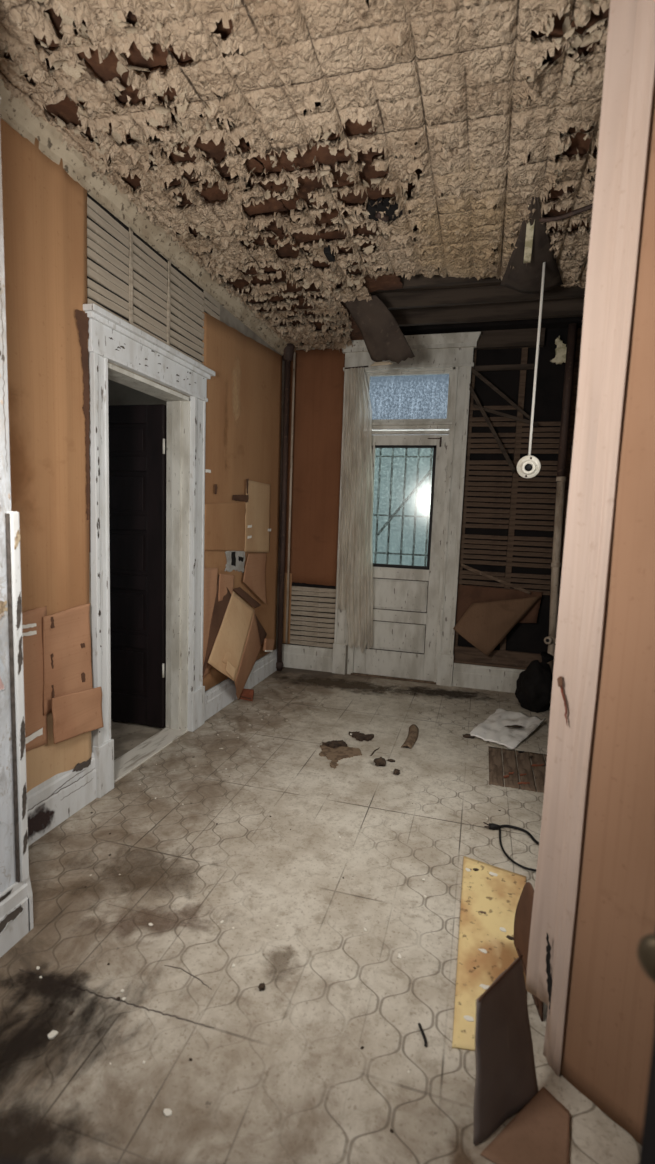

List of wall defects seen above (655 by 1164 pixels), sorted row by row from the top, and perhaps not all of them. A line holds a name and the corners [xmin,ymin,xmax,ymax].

peeling [516,0,610,113]
peeling [4,0,412,350]
peeling [542,125,599,285]
spalling [87,193,219,385]
peeling [0,591,23,675]
peeling [9,716,26,759]
spalling [0,904,24,934]